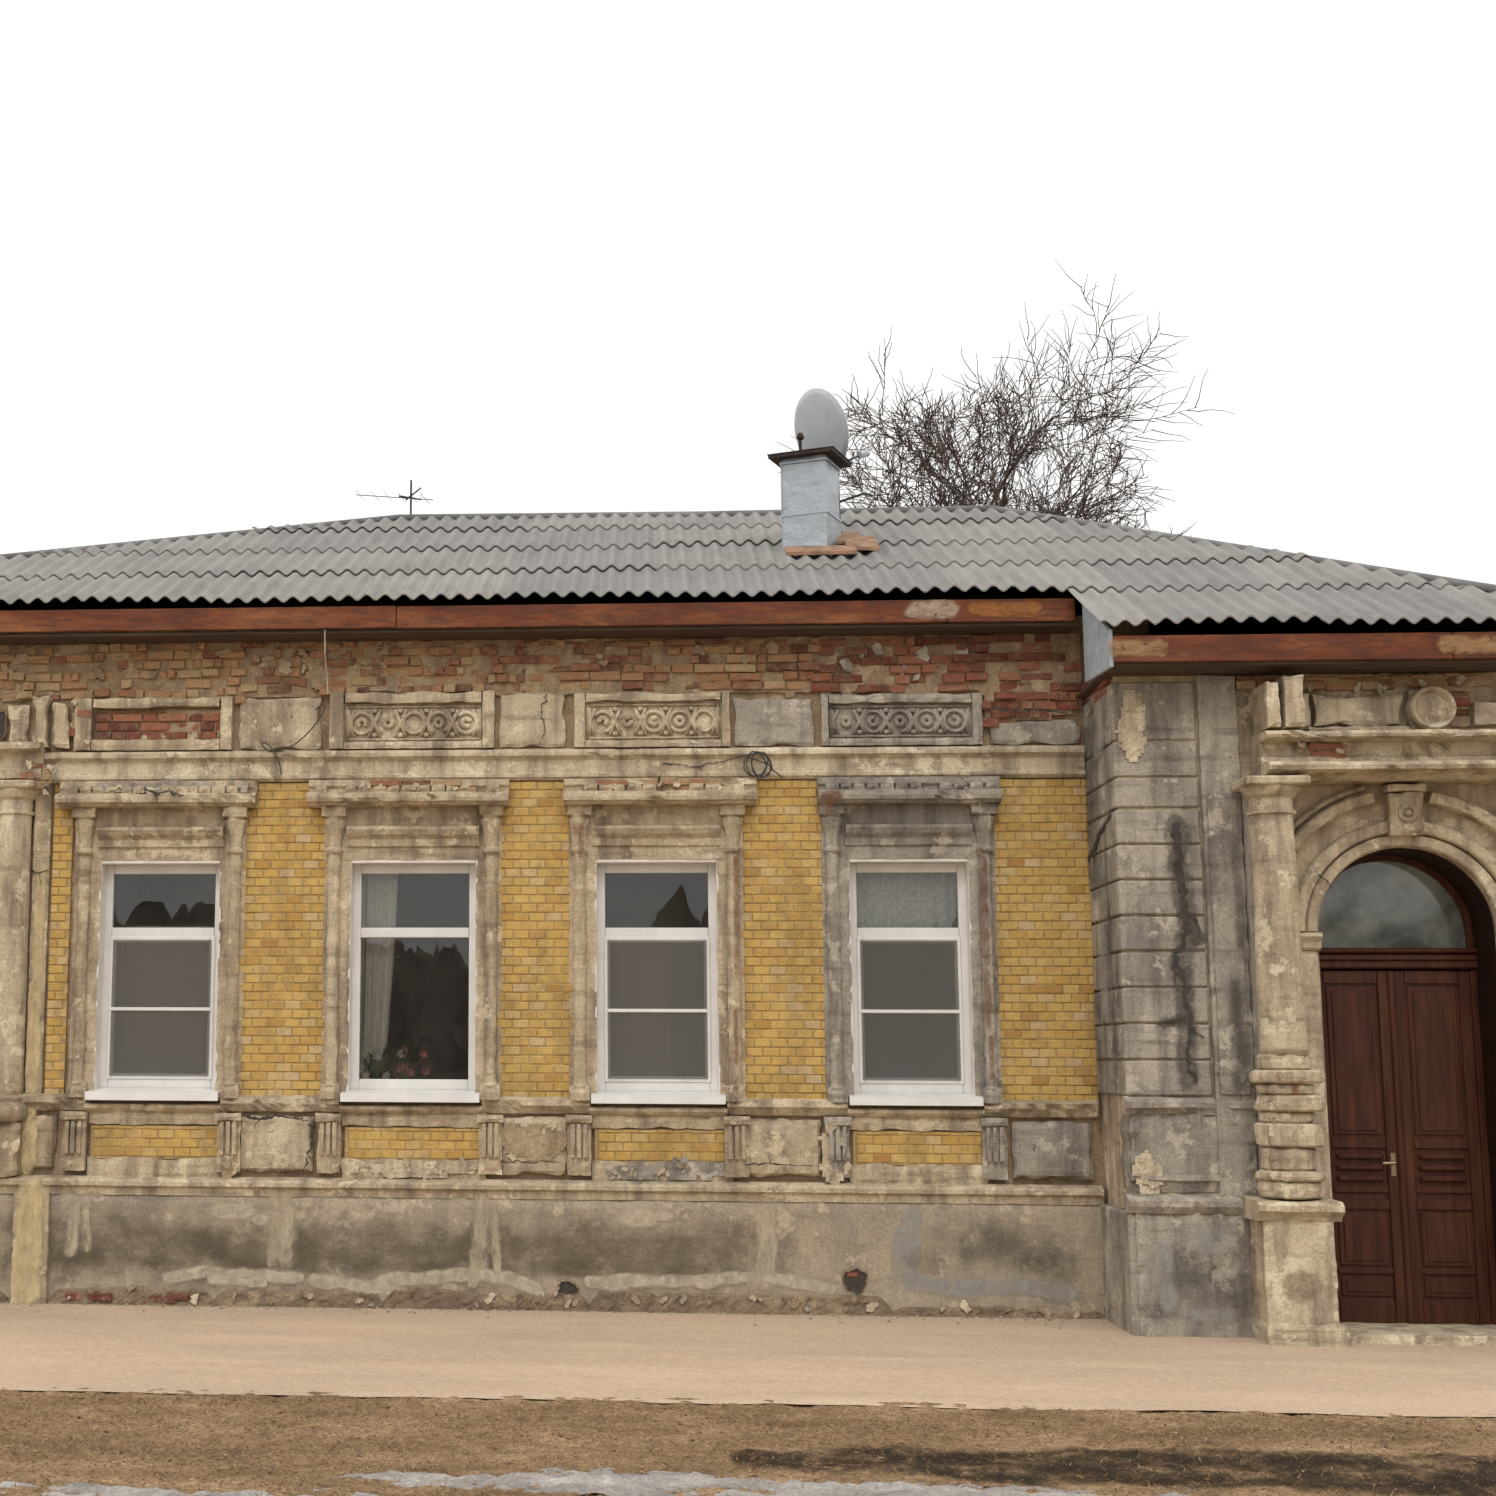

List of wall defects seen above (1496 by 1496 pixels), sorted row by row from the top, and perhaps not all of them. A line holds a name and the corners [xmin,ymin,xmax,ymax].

peeling [1438,635,1496,654]
spalling [0,600,1147,762]
spalling [1235,672,1496,727]
spalling [1297,742,1351,758]
crack [1088,809,1112,868]